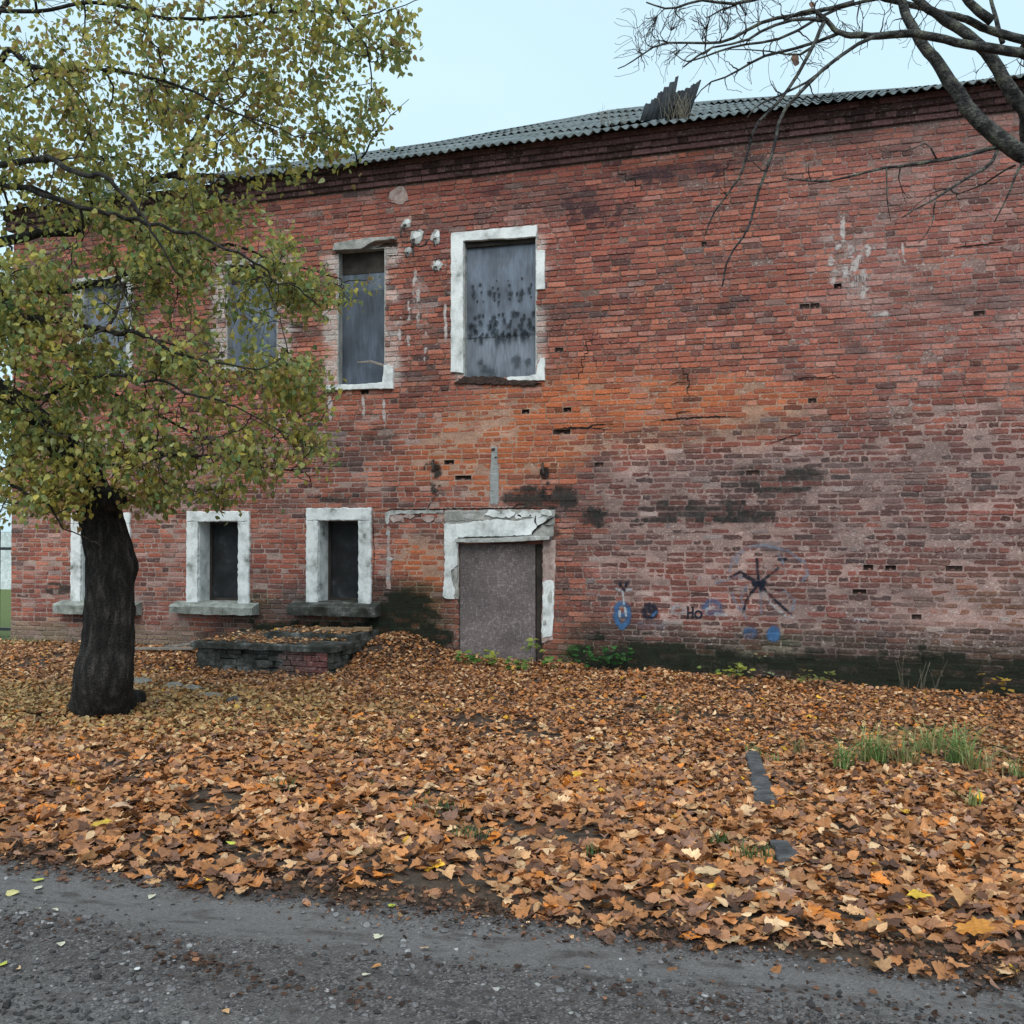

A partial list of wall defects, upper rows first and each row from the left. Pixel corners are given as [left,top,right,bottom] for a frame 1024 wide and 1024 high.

leakage [828,217,871,298]
crack [573,328,598,384]
crack [650,370,736,422]
peeling [385,509,552,599]